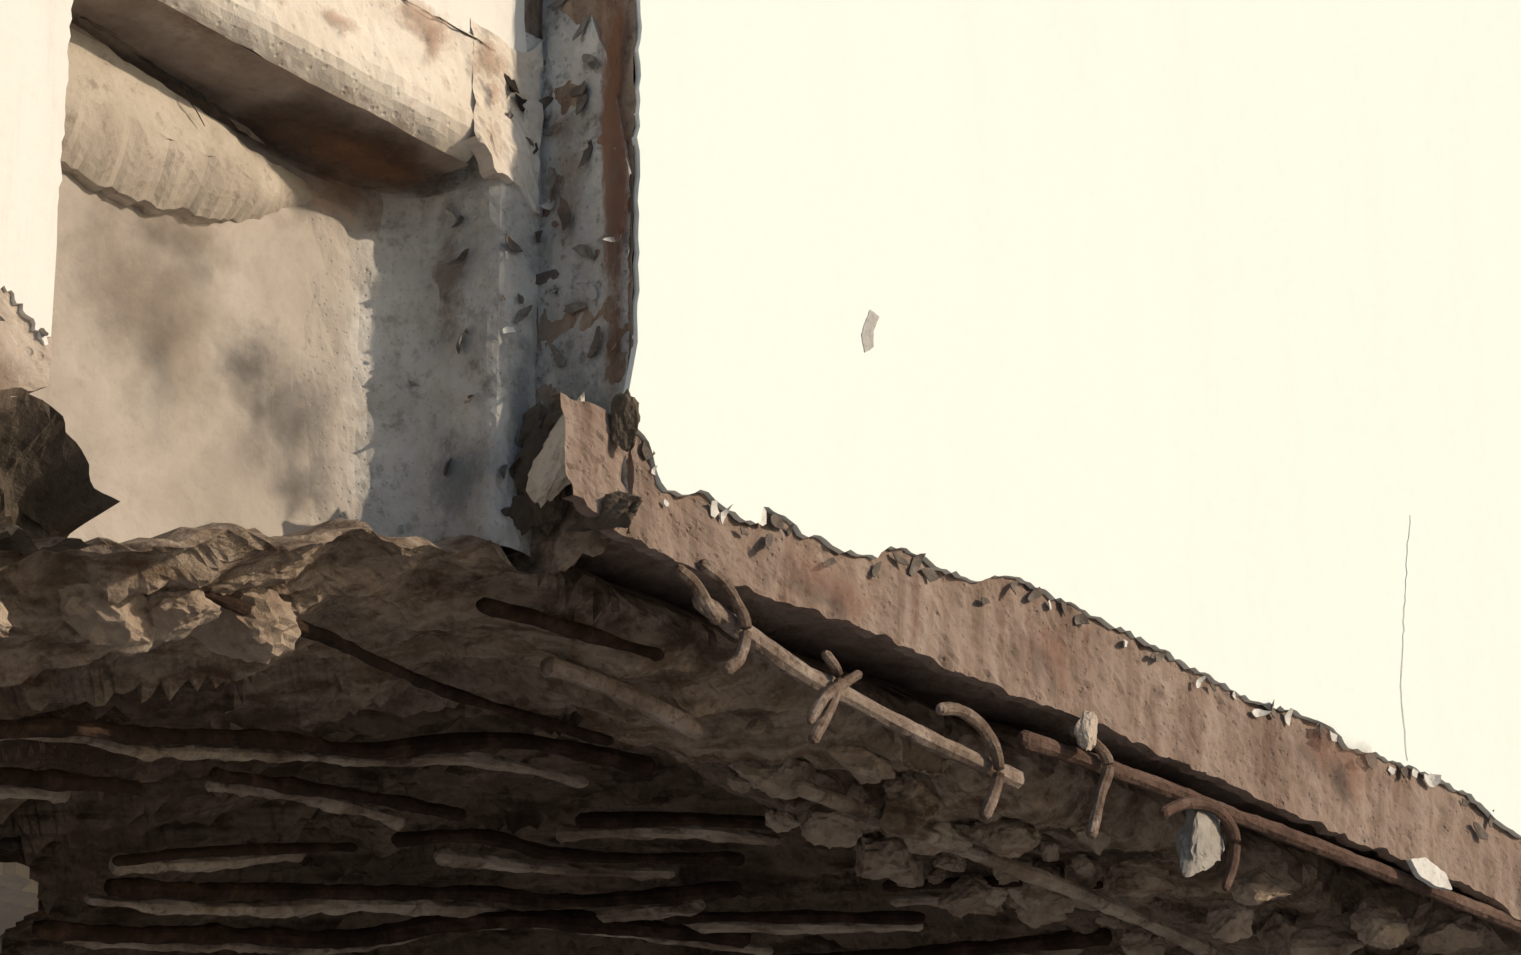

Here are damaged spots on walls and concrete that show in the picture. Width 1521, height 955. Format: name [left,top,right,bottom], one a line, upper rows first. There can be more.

corrosion [601,0,628,358]
spalling [0,288,120,555]
spalling [200,590,252,616]
peeling [476,0,1521,935]
spalling [0,619,1236,955]